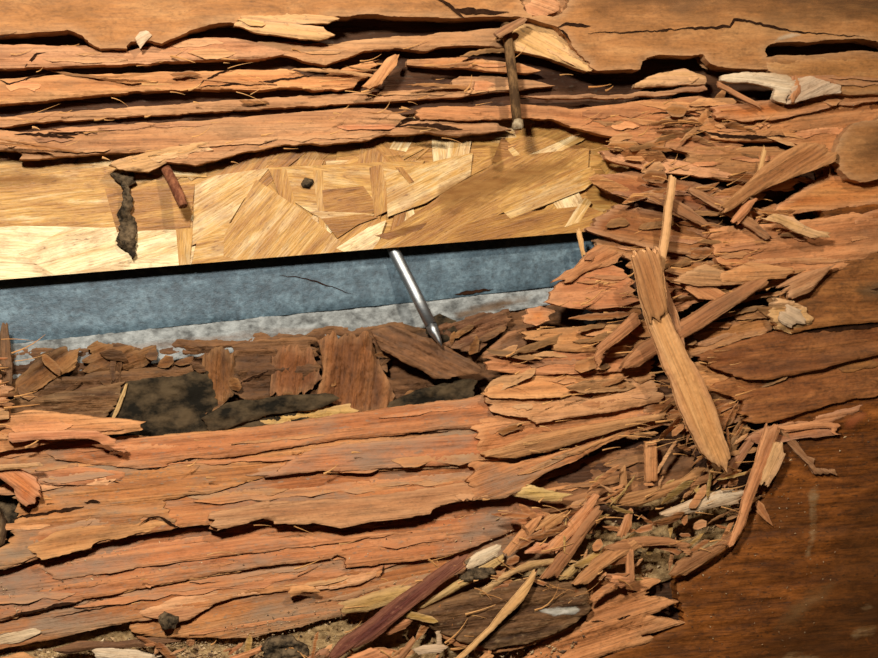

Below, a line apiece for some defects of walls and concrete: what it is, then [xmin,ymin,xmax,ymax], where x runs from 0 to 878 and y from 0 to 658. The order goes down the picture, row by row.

peeling [0,13,512,173]
crack [439,0,509,19]
peeling [509,0,593,74]
peeling [516,57,878,212]
crack [556,18,863,41]
peeling [664,173,878,444]
crack [800,322,878,333]
peeling [0,204,695,649]